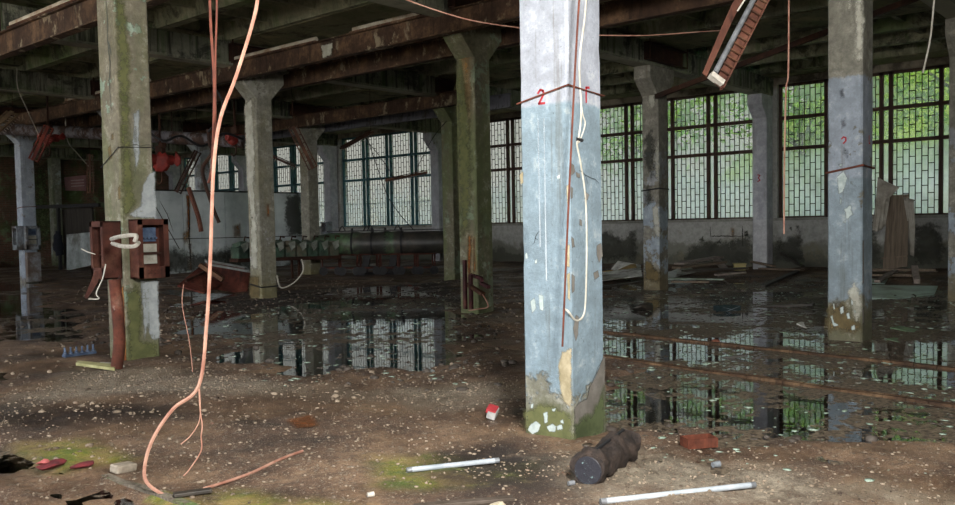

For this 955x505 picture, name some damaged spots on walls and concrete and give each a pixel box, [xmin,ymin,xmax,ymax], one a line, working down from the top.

peeling [557,164,580,204]
peeling [593,243,603,279]
damp [602,231,661,282]
damp [681,234,753,264]
damp [774,235,804,262]
damp [914,222,946,265]
peeling [831,300,864,330]
spalling [528,315,606,434]